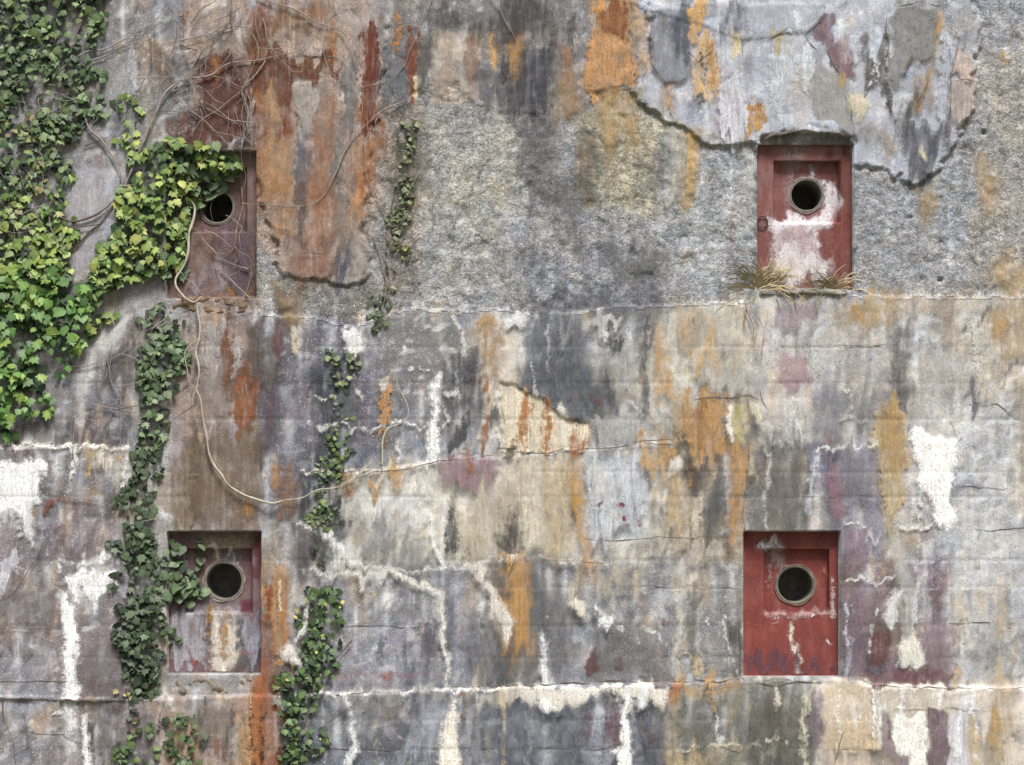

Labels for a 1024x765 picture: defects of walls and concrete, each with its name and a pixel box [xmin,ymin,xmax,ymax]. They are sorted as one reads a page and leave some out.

corrosion [176,2,341,238]
corrosion [274,97,336,329]
corrosion [347,19,384,235]
spalling [177,0,1024,331]
corrosion [555,0,653,207]
leakage [0,418,149,765]
corrosion [157,683,174,711]
corrosion [172,218,299,765]
leakage [280,589,311,667]
leakage [290,307,704,765]
leakage [706,426,1024,765]